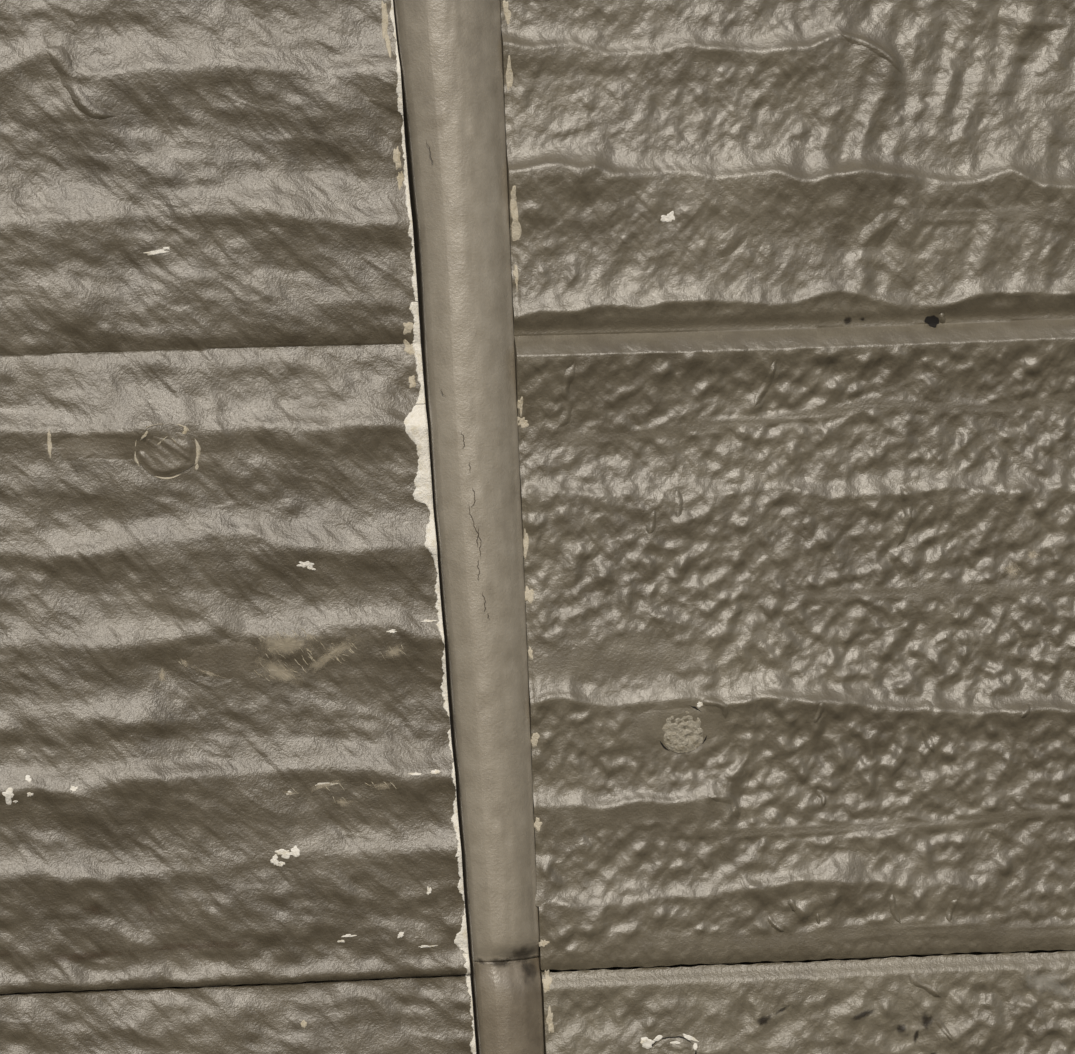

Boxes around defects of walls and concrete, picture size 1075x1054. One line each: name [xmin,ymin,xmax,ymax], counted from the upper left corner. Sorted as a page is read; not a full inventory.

peeling [381,0,476,1054]
crack [402,99,478,1054]
crack [461,433,489,617]
peeling [2,775,33,805]
peeling [270,845,300,867]